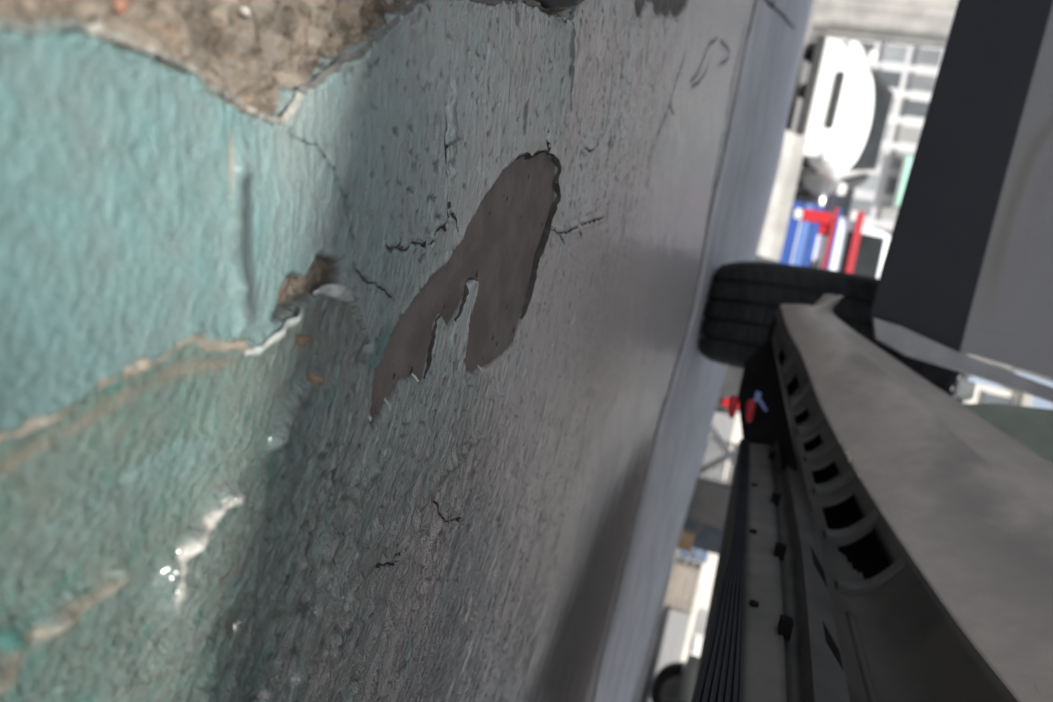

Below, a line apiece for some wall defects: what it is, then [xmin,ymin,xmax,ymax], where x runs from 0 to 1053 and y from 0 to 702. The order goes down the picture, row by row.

spalling [475,0,584,23]
spalling [0,0,419,125]
crack [551,202,609,250]
crack [355,268,392,298]
peeling [369,150,562,423]
crack [433,500,461,528]